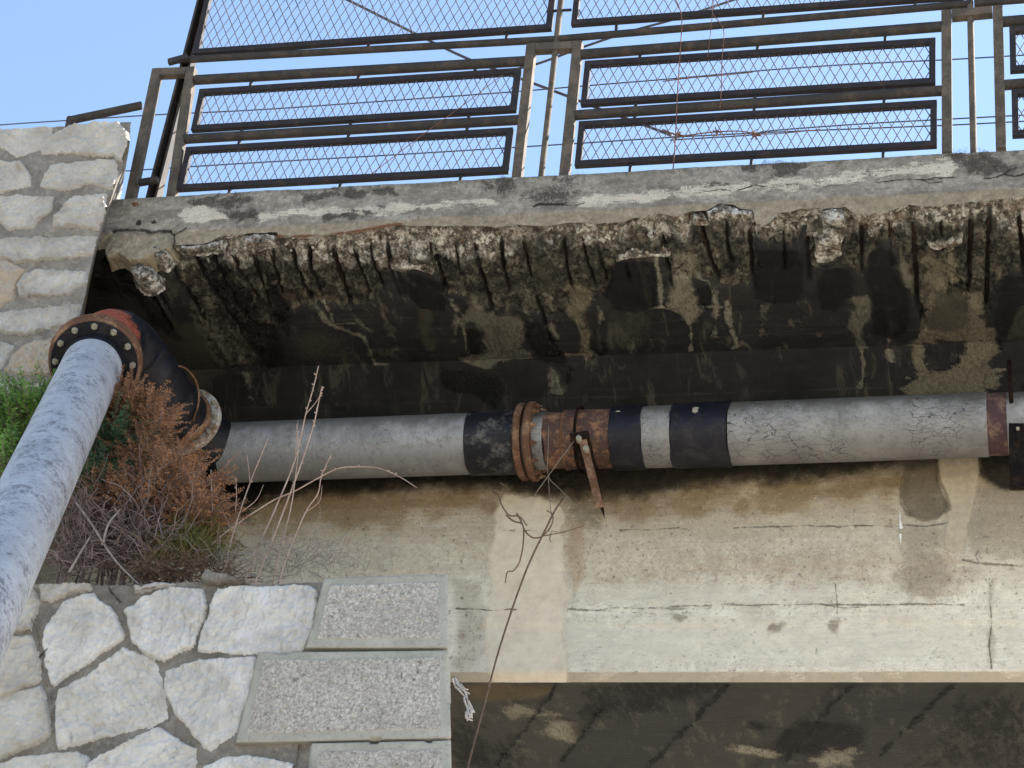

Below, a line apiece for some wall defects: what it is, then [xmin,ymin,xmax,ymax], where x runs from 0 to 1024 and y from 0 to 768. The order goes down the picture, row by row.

crack [112,227,187,250]
leakage [93,244,290,400]
leakage [298,268,398,366]
leakage [397,251,739,406]
spalling [130,197,1024,366]
leakage [754,246,1024,395]
leakage [180,456,1009,683]
crack [569,584,965,614]
crack [962,550,1017,567]
crack [986,607,994,669]
leakage [502,683,718,743]